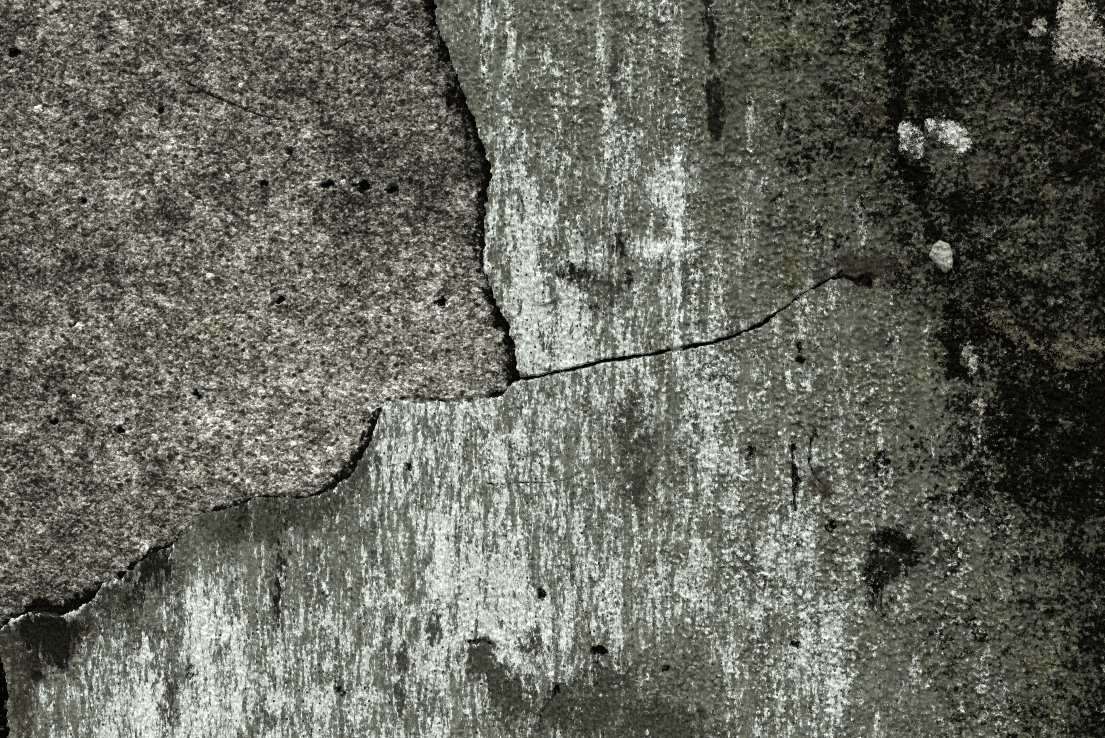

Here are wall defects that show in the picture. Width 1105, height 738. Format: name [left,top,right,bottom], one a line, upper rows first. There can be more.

spalling [853,274,875,289]
spalling [0,0,515,653]
crack [516,273,863,381]
spalling [790,430,817,511]
spalling [867,449,891,478]
spalling [859,562,890,598]
spalling [870,529,925,568]
peeling [517,620,553,656]
peeling [156,658,197,738]
peeling [393,638,408,719]
peeling [465,634,725,738]